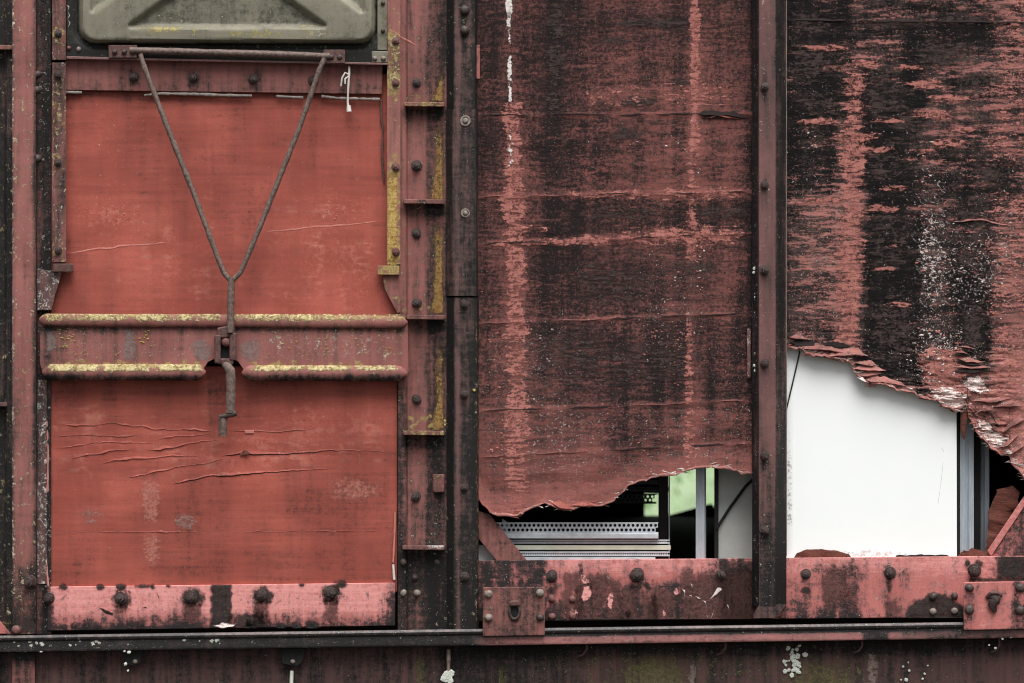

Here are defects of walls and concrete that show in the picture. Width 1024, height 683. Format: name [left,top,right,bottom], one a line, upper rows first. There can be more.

peeling [915,206,1024,319]
peeling [790,334,907,387]
peeling [900,315,1024,454]
crack [52,422,383,484]
peeling [551,500,597,510]
rust [965,557,1024,582]
rust [111,590,132,613]
rust [180,587,205,624]
rust [253,585,275,623]
rust [322,585,341,621]